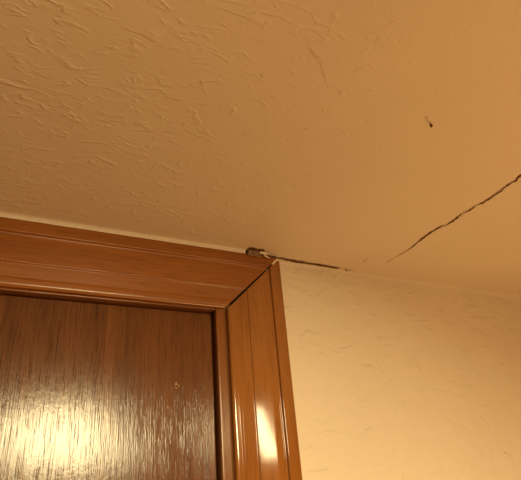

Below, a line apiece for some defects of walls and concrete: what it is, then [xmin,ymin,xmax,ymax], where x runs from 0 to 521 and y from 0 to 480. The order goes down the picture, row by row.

crack [390,175,521,261]
spalling [247,247,271,258]
crack [267,254,339,269]